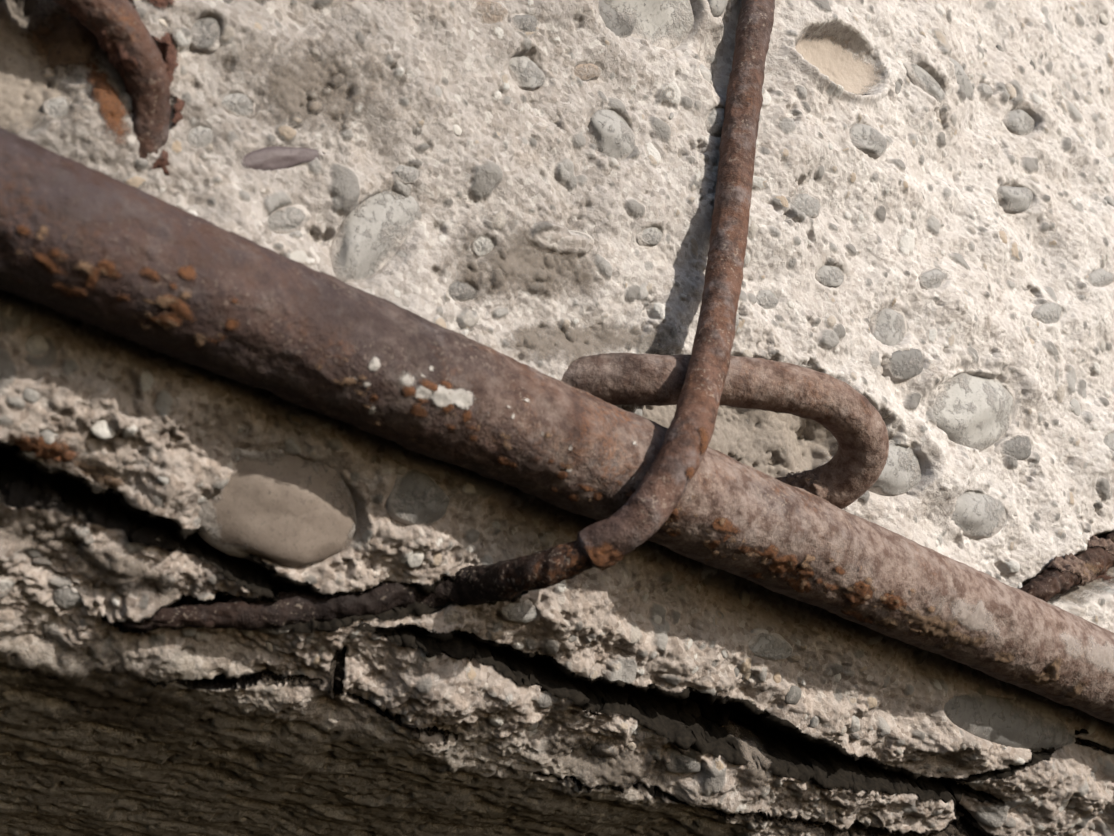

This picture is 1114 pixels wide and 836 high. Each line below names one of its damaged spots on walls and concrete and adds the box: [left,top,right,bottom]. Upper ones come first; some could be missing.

rust [22,9,130,145]
rust [147,0,179,86]
rust [9,435,122,487]
spalling [622,405,676,428]
spalling [708,405,838,478]
spalling [1050,566,1114,604]
crack [0,441,1114,836]